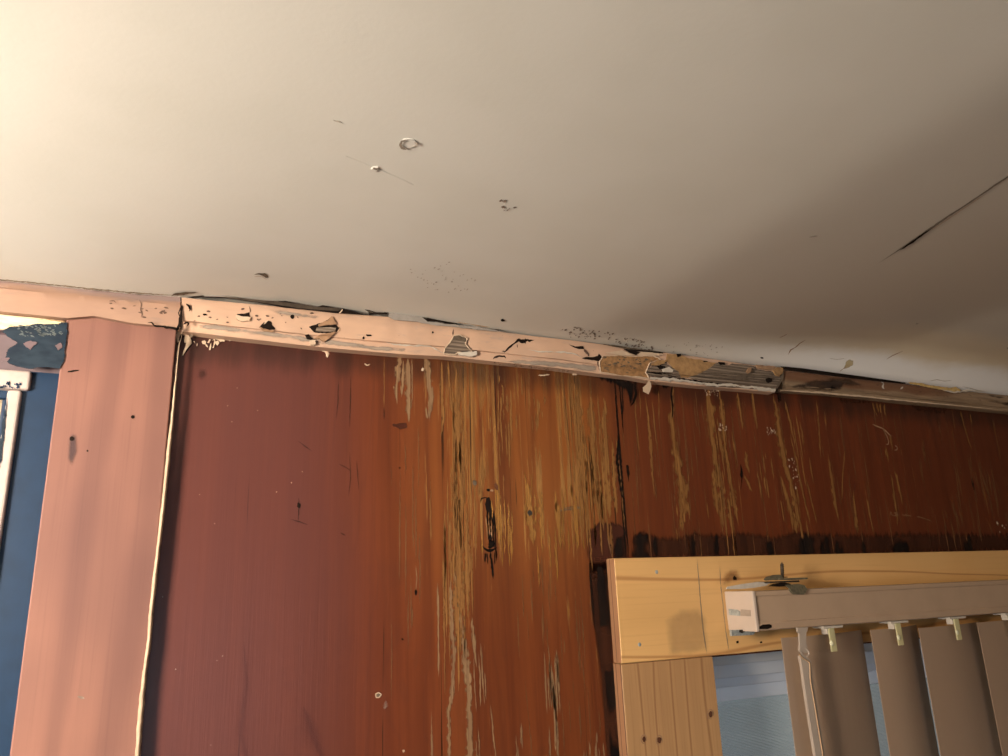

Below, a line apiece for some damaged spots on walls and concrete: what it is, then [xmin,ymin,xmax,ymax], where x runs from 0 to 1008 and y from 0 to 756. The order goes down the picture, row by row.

crack [882,176,1008,261]
spalling [389,334,477,357]
spalling [599,343,783,394]
water stain [383,357,546,756]
water stain [516,377,1008,756]